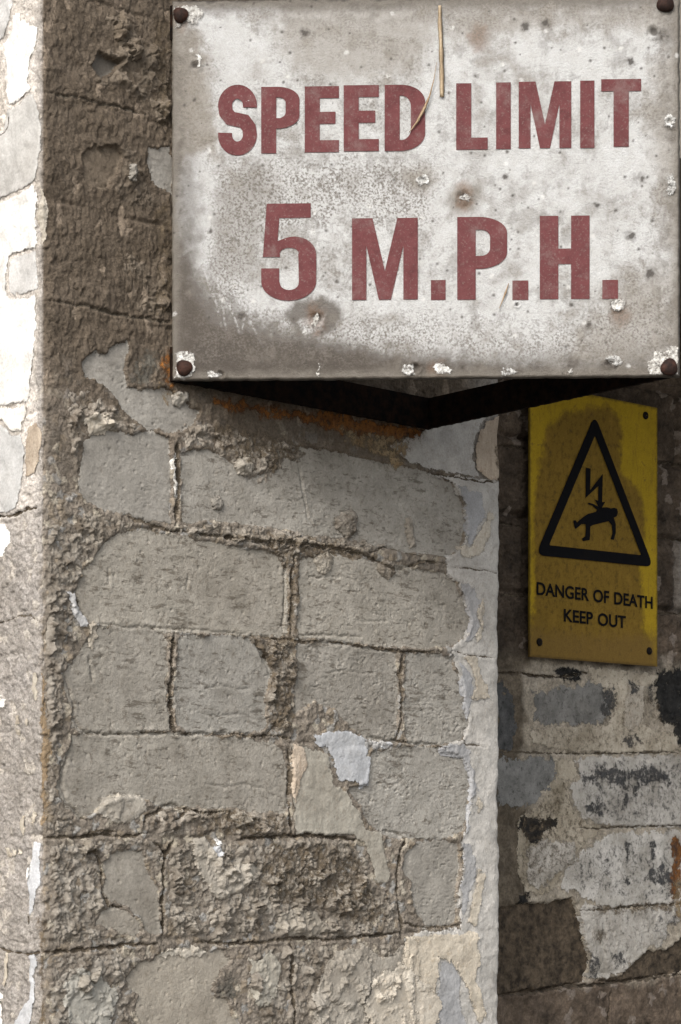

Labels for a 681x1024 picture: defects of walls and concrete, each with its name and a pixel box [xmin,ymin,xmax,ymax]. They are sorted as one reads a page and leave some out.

flaking render [88,15,172,124]
flaking render [115,147,172,212]
flaking render [124,253,171,318]
crack [129,443,675,755]
peeling [0,340,681,1024]
crack [0,805,224,956]